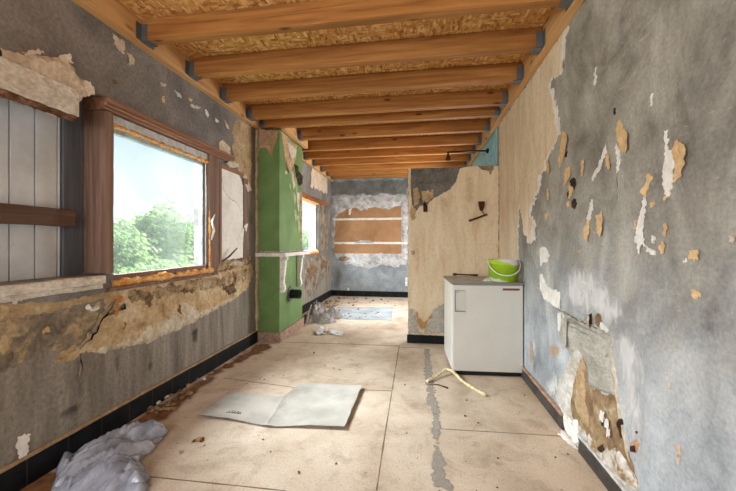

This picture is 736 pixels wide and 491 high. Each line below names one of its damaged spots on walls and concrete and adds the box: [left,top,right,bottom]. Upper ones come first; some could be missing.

peeling [0,48,95,102]
peeling [113,34,135,66]
peeling [174,90,253,191]
peeling [285,163,408,297]
peeling [558,108,627,209]
peeling [633,130,686,255]
crack [78,299,126,377]
spalling [0,256,253,373]
peeling [408,304,444,334]
peeling [539,246,564,332]
spalling [556,349,640,491]